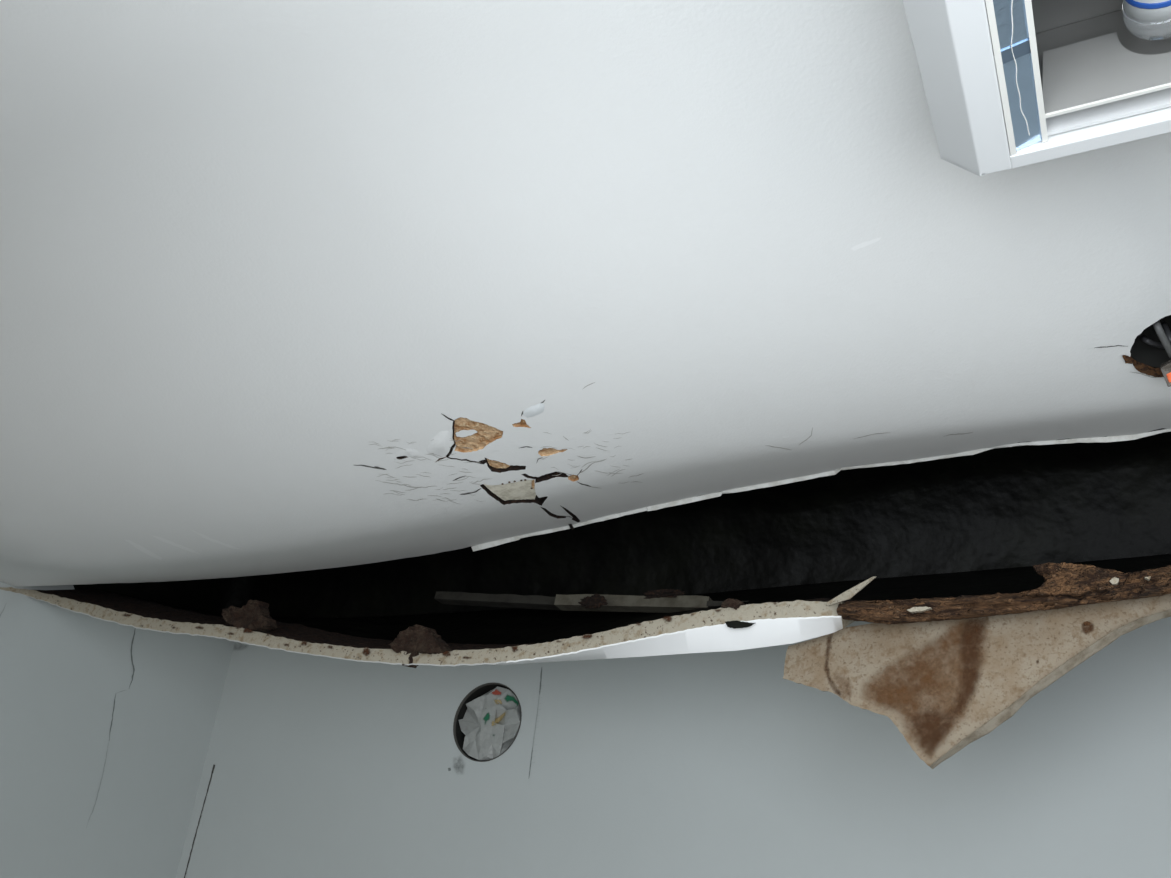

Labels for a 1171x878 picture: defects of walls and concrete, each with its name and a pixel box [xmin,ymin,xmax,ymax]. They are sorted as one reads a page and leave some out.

spalling [454,417,545,501]
crack [87,628,136,824]
damp [869,621,983,748]
peeling [783,562,1171,769]